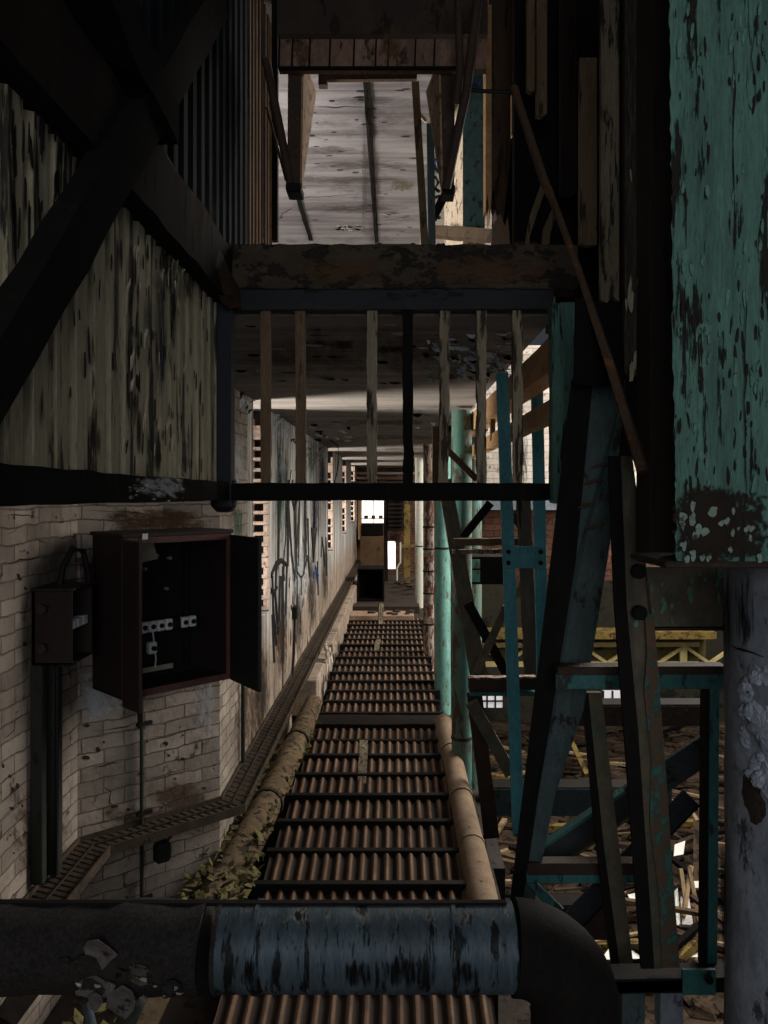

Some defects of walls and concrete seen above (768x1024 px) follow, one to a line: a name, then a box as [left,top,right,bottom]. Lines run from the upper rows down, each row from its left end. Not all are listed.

peeling [675,2,708,90]
peeling [729,1,768,114]
peeling [672,194,768,604]
flaking render [740,771,766,825]